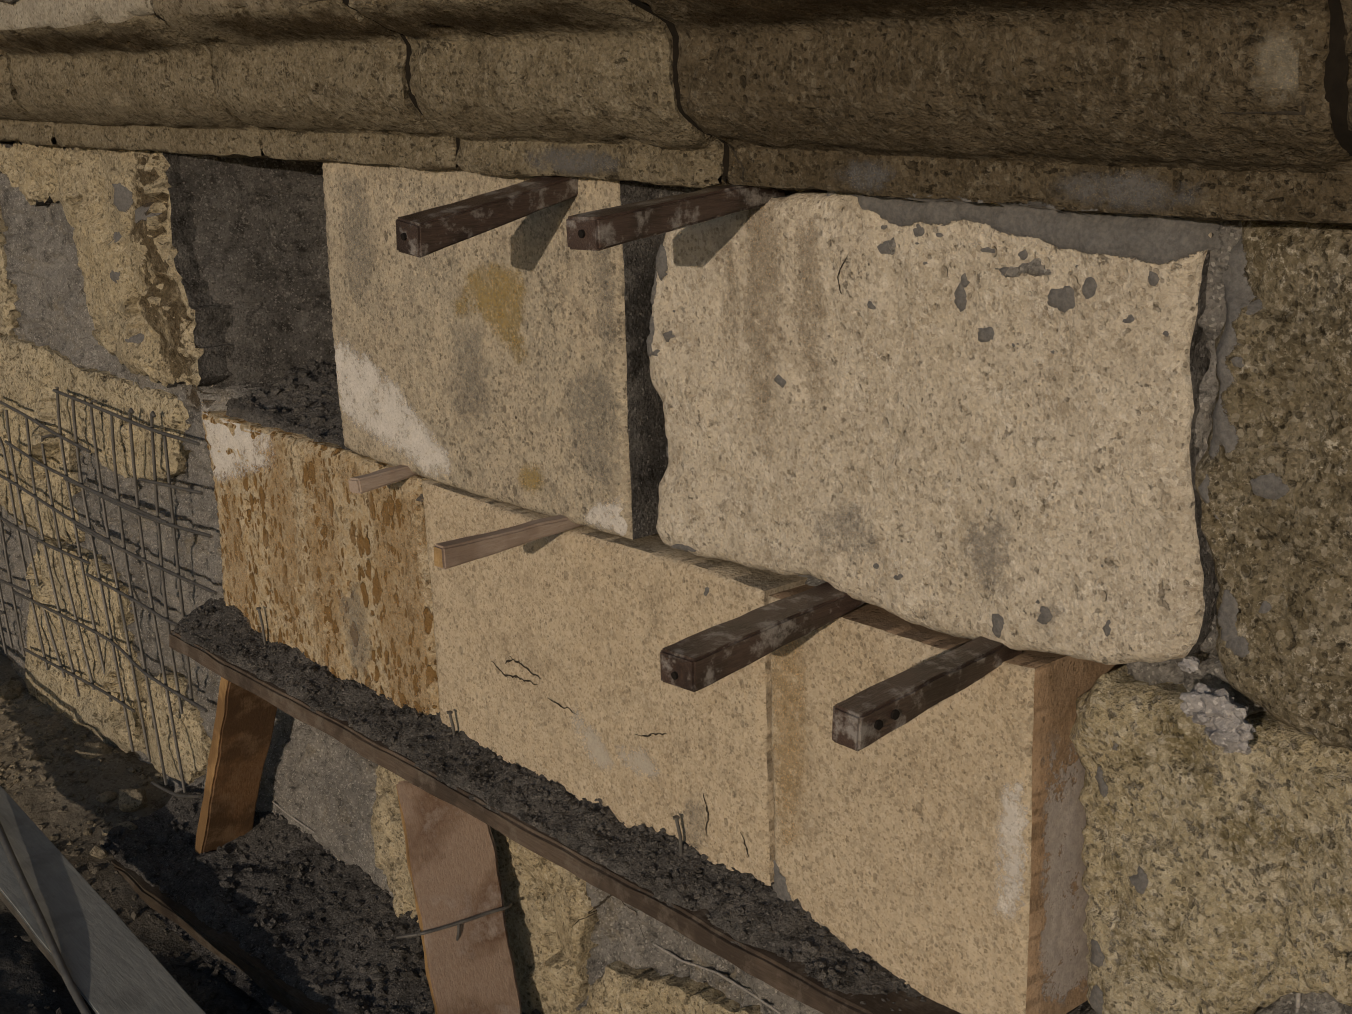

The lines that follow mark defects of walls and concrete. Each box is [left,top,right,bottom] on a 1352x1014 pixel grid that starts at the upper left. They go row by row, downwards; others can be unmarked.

peeling [112,183,161,223]
crack [343,0,423,115]
crack [453,137,461,157]
crack [576,0,749,184]
crack [1222,0,1352,156]
leakage [131,154,274,480]
leakage [334,342,450,476]
crack [491,656,577,715]